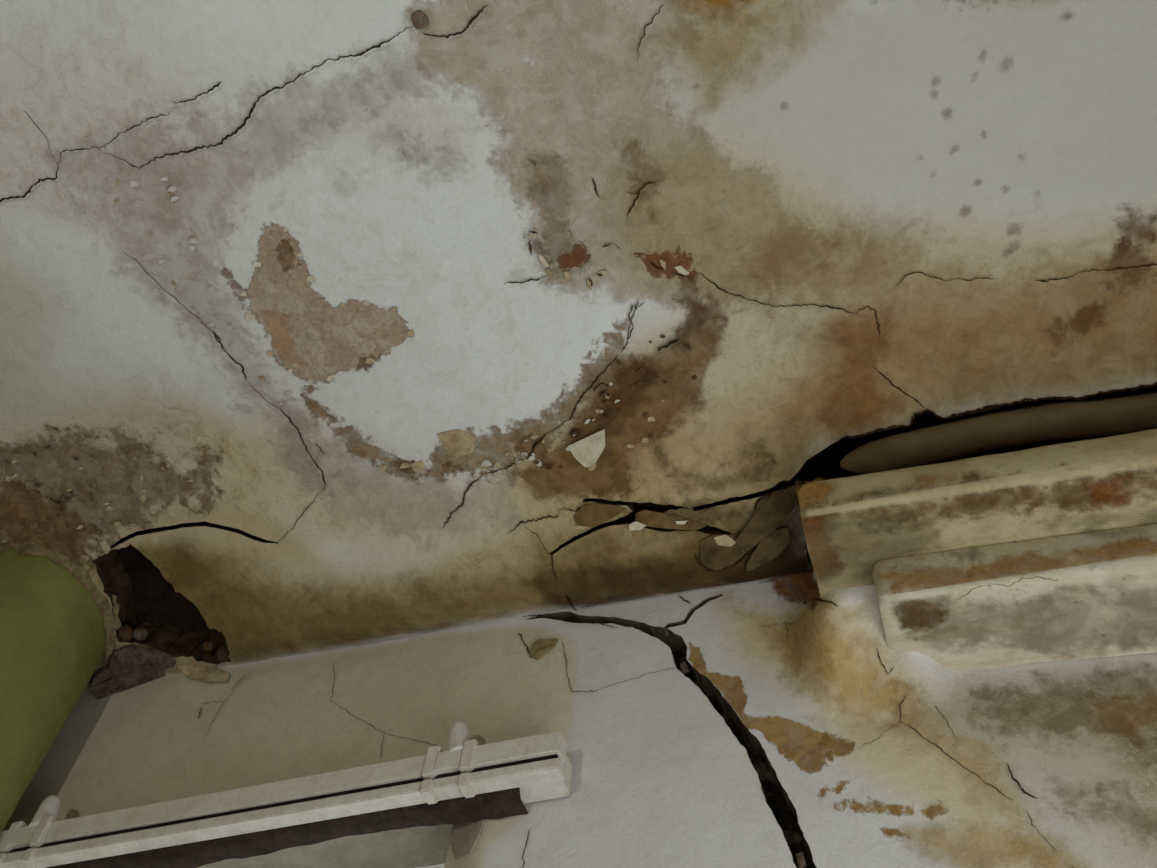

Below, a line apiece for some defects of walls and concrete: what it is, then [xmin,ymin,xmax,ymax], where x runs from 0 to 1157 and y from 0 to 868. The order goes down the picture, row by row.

crack [0,5,488,203]
rust [684,0,792,90]
leakage [0,425,223,572]
spalling [88,502,231,700]
crack [110,252,326,549]
peeling [172,222,415,407]
leakage [301,0,803,498]
peeling [562,360,646,471]
spalling [509,477,804,578]
leakage [157,470,1157,660]
crack [523,594,817,868]
leakage [820,781,1072,868]